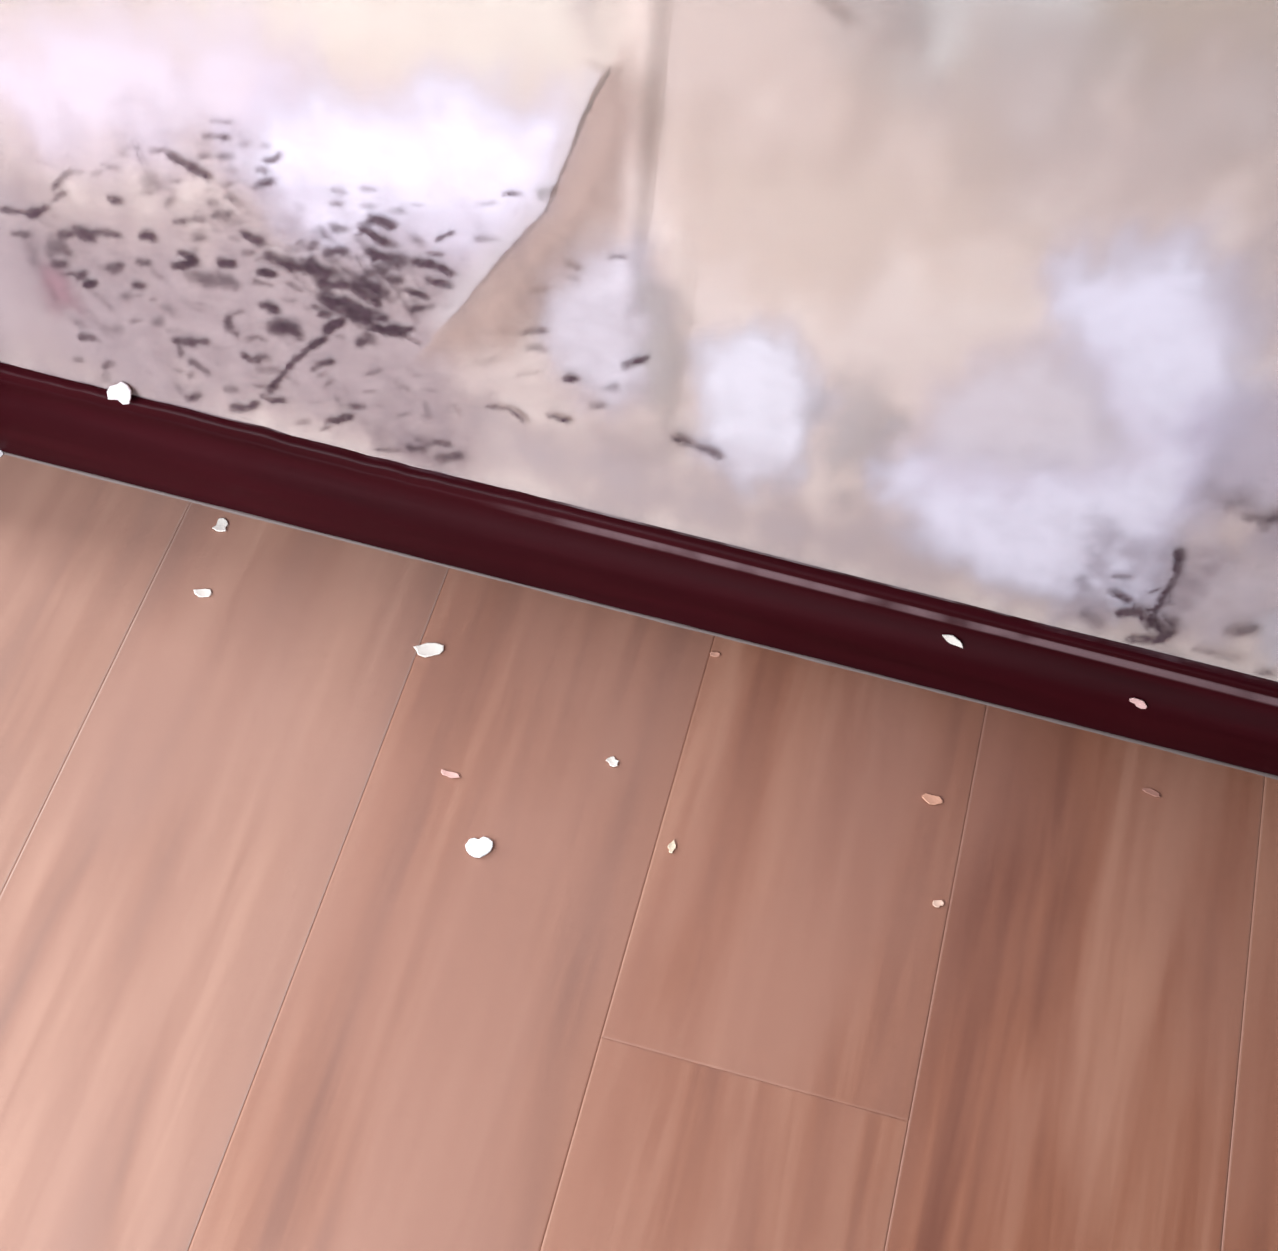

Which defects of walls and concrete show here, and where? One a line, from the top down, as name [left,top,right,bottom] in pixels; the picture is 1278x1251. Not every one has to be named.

damp [166,153,208,180]
peeling [435,69,626,347]
damp [0,173,471,462]
damp [1196,401,1278,521]
damp [1110,527,1278,644]